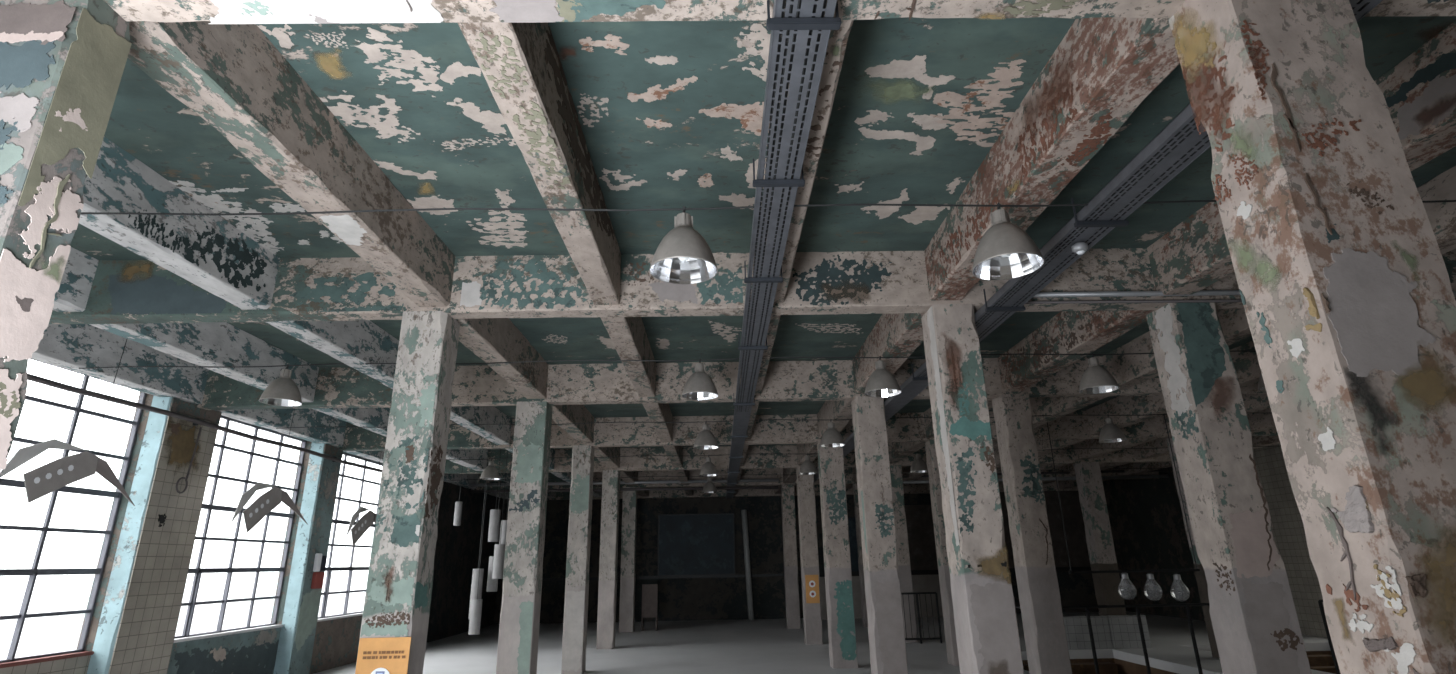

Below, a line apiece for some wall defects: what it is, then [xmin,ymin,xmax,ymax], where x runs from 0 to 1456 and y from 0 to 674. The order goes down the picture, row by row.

peeling [0,31,63,43]
peeling [579,34,630,55]
peeling [737,23,771,82]
peeling [0,92,39,132]
peeling [241,8,574,189]
peeling [627,55,698,129]
peeling [699,102,770,136]
peeling [854,55,1080,184]
peeling [667,146,766,210]
peeling [373,160,529,270]
peeling [835,177,994,277]
peeling [1349,613,1420,674]